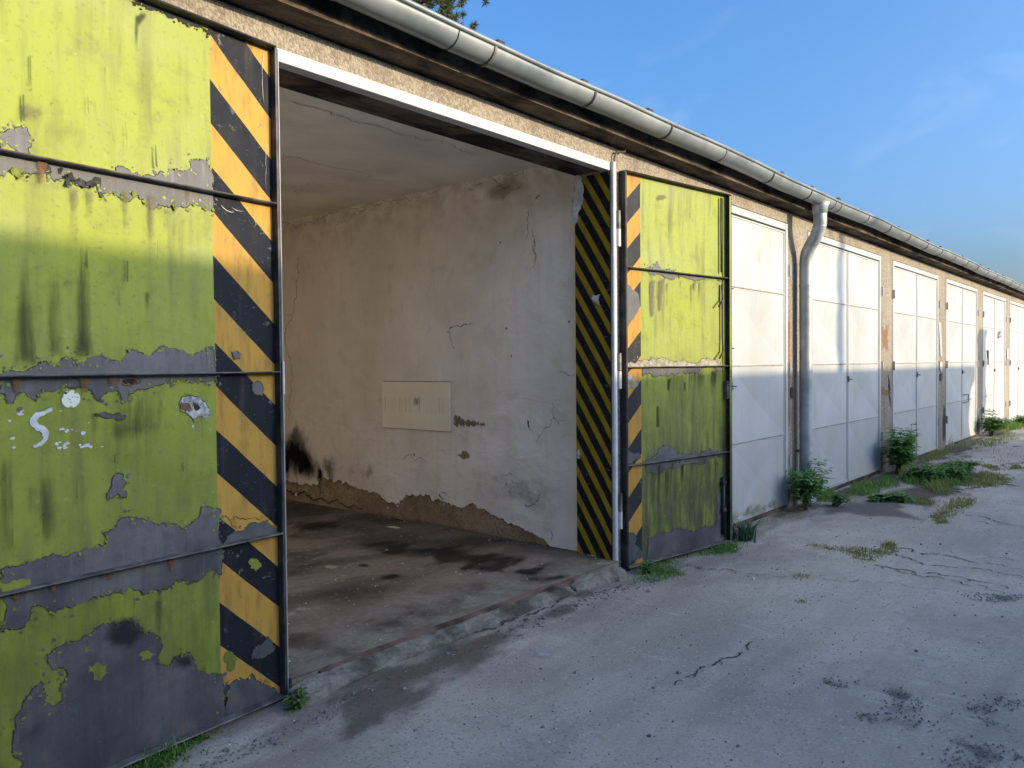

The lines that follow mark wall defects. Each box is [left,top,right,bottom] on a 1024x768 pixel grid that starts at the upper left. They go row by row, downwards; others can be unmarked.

peeling [0,123,220,217]
spalling [572,175,584,225]
damp [21,299,33,359]
damp [79,283,89,352]
peeling [0,345,221,449]
peeling [628,356,723,389]
peeling [627,445,726,476]
spalling [285,477,549,546]
peeling [0,464,278,634]
crack [823,548,1021,591]
peeling [2,617,278,768]
crack [674,641,753,684]